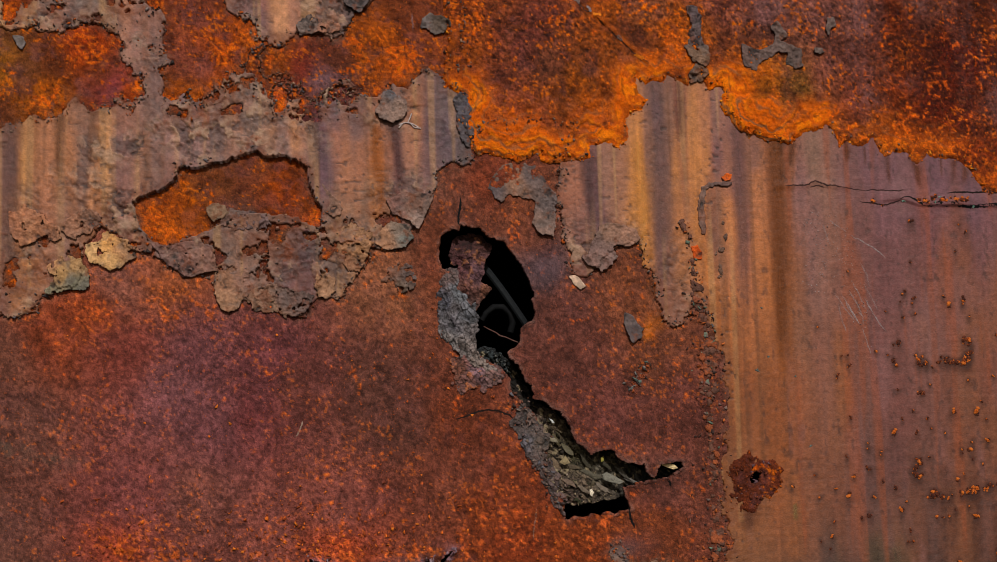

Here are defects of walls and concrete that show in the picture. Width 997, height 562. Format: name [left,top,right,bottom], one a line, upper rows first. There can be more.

rust [166,104,188,120]
peeling [8,204,137,295]
rust [201,237,229,270]
peeling [152,241,336,319]
rust [242,239,274,283]
peeling [322,184,434,272]
rust [448,233,492,310]
peeling [488,163,558,236]
crack [785,180,997,209]
peeling [436,267,505,395]
crack [454,409,513,420]
crack [421,547,458,562]